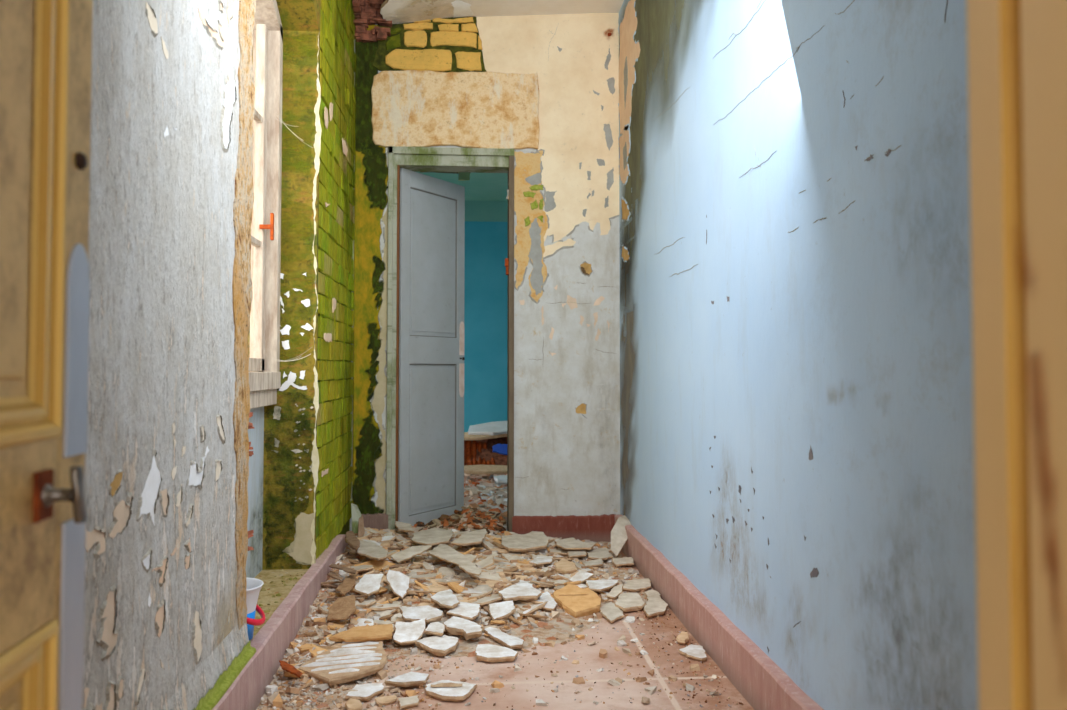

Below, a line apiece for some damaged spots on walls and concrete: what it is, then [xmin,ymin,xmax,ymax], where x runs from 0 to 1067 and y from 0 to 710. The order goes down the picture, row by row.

crack [714,0,855,122]
flaking render [85,0,256,638]
peeling [279,0,640,566]
leakage [620,0,701,516]
peeling [96,584,119,661]
peeling [83,669,145,710]
peeling [192,610,202,665]